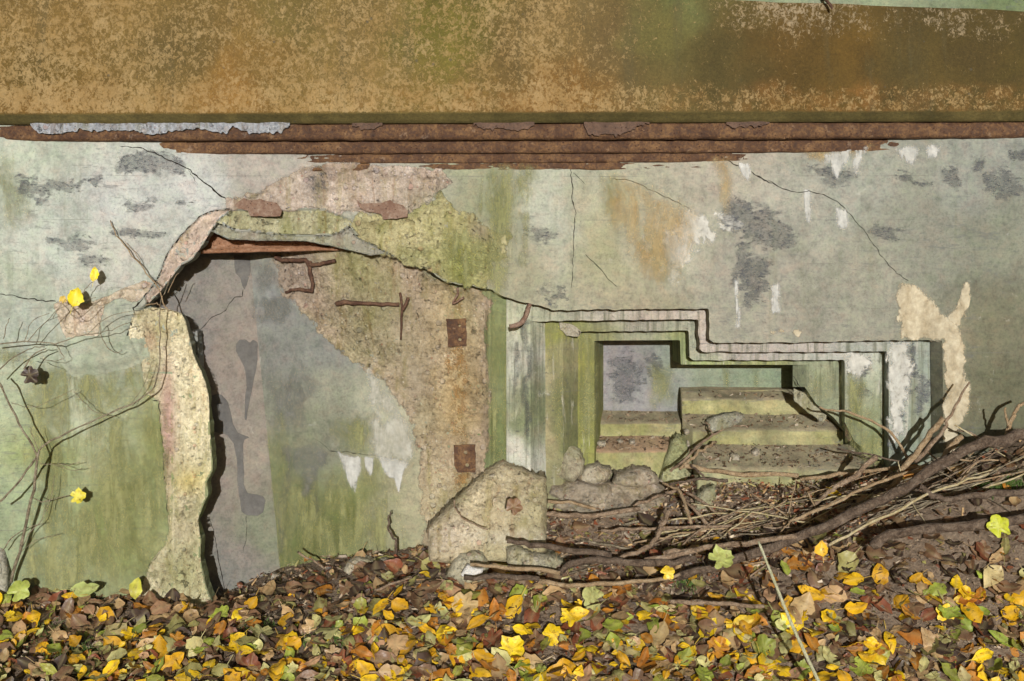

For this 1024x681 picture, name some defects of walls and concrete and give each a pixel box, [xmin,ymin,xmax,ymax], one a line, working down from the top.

peeling [30,122,290,135]
crack [121,146,236,336]
corrosion [473,122,534,131]
crack [570,169,616,287]
corrosion [584,122,650,138]
water stain [640,197,798,327]
crack [718,155,907,280]
water stain [817,149,862,188]
water stain [894,145,962,186]
spalling [54,162,513,604]
water stain [339,368,412,492]
peeling [896,282,971,452]